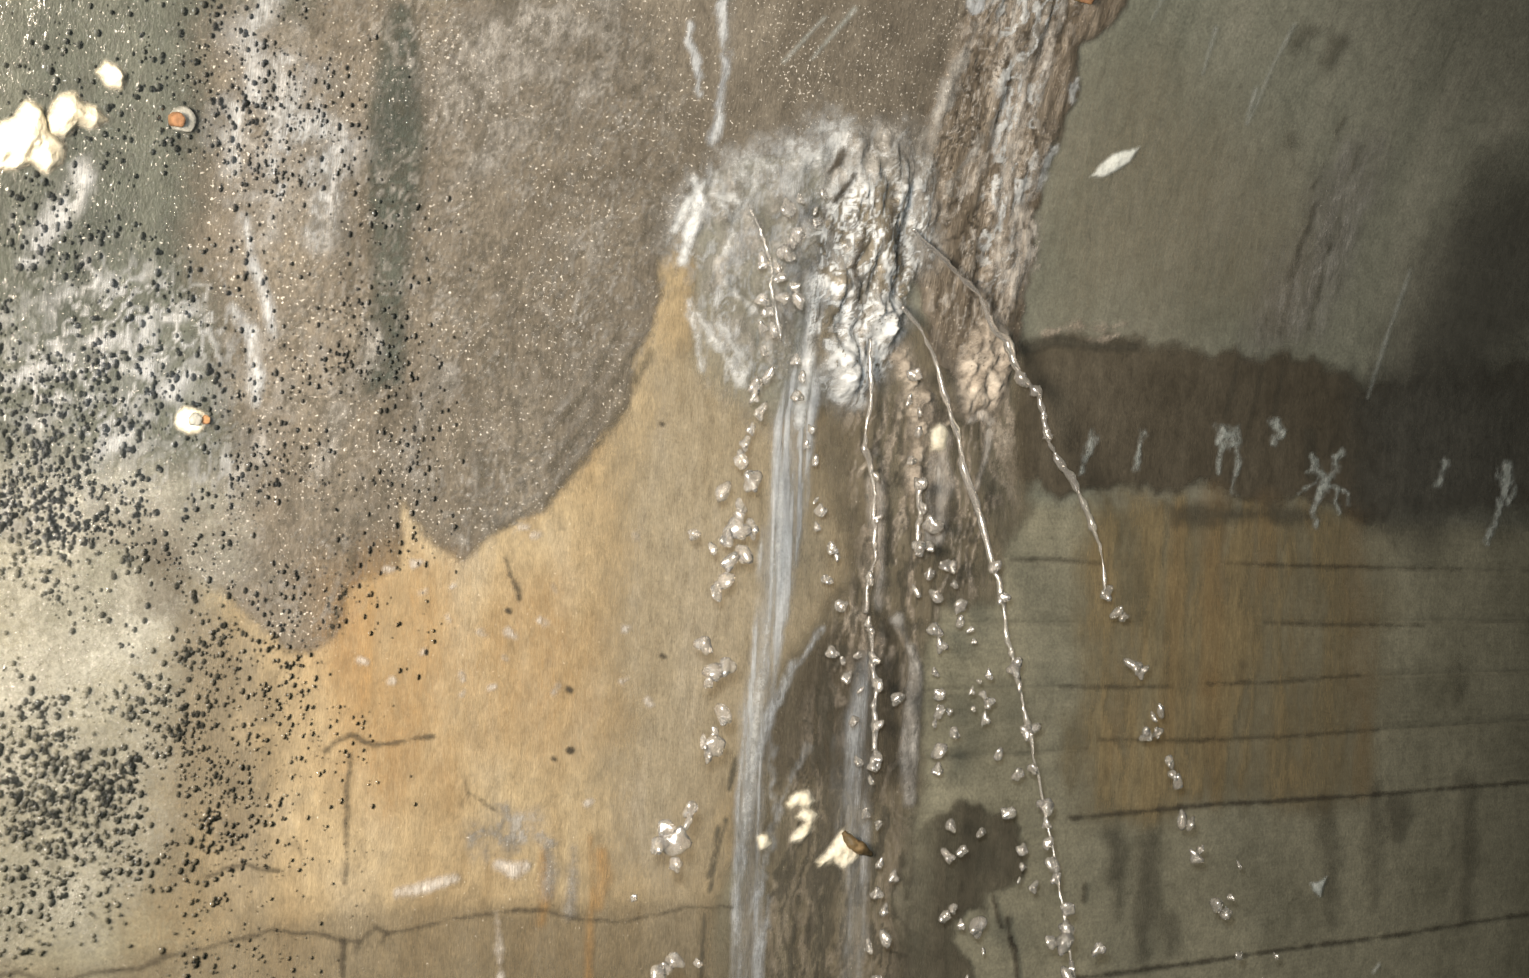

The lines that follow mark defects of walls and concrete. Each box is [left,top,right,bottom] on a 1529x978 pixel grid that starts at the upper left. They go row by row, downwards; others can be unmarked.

leakage [946,0,1066,297]
leakage [760,286,797,665]
leakage [806,372,820,471]
peeling [931,424,948,450]
corrosion [155,229,855,978]
crack [295,933,345,976]
crack [325,734,433,876]
peeling [758,835,771,850]
peeling [788,791,817,841]
peeling [819,831,859,868]
leakage [908,801,1025,978]
crack [992,899,1019,978]